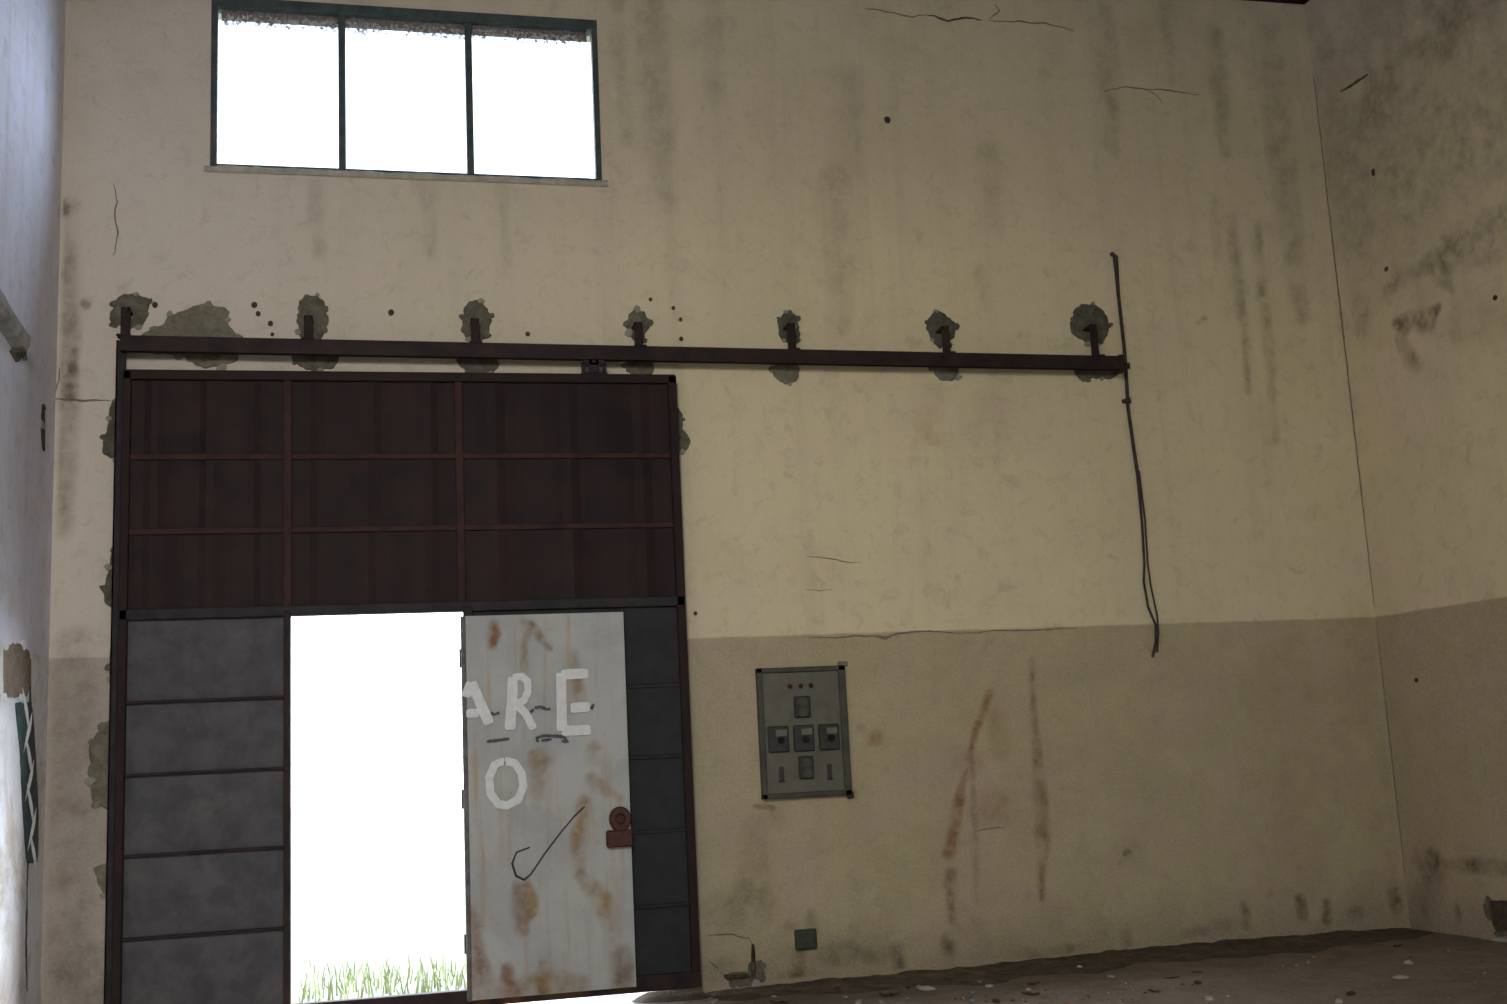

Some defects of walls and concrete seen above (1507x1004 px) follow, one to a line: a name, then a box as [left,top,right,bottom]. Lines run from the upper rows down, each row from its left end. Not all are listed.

crack [865,4,1073,31]
crack [112,186,120,256]
flaking render [109,292,244,370]
flaking render [291,293,339,371]
flaking render [456,298,499,373]
flaking render [623,297,653,343]
flaking render [776,310,801,343]
flaking render [925,309,960,349]
flaking render [1070,301,1113,347]
flaking render [769,365,800,386]
flaking render [1074,370,1118,382]
flaking render [84,721,109,810]